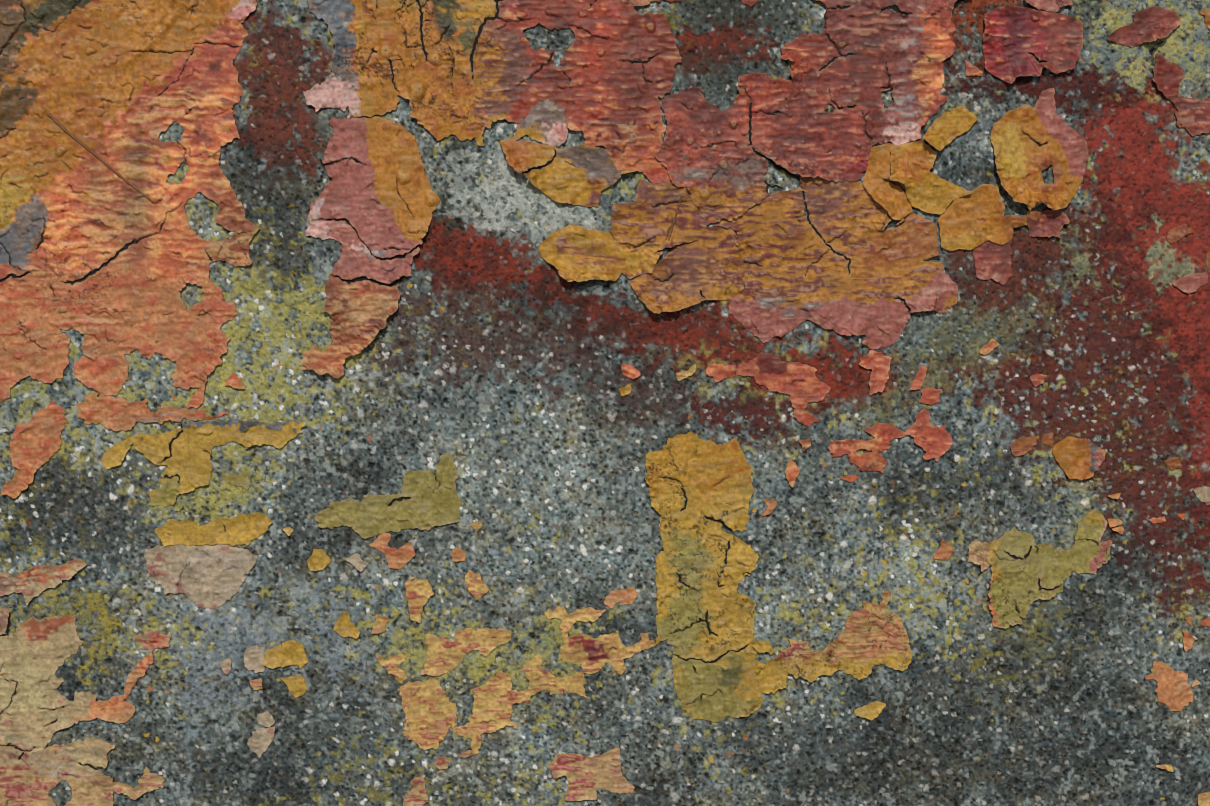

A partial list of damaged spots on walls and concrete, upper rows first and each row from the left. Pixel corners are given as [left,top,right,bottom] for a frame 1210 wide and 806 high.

crack [470,0,525,79]
crack [623,54,660,83]
peeling [1152,53,1210,136]
crack [522,150,575,173]
crack [60,238,142,284]
peeling [0,0,305,609]
peeling [301,0,1089,487]
peeling [1010,433,1106,480]
peeling [315,431,913,769]
crack [660,477,748,702]
peeling [933,509,1124,629]
peeling [0,558,171,806]